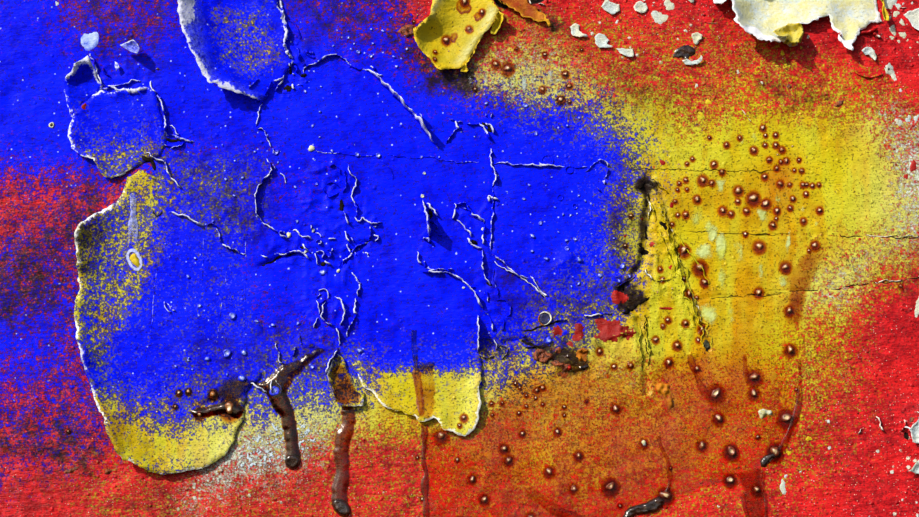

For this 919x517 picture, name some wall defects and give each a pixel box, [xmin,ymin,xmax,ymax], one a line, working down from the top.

peeling [413,0,551,72]
peeling [570,23,634,57]
peeling [713,0,889,61]
crack [89,54,194,189]
crack [151,0,919,375]
peeling [64,55,263,475]
corrosion [190,381,244,418]
corrosion [255,349,323,470]
corrosion [331,377,358,517]
peeling [327,342,482,436]
corrosion [611,382,724,517]
corrosion [737,383,802,517]